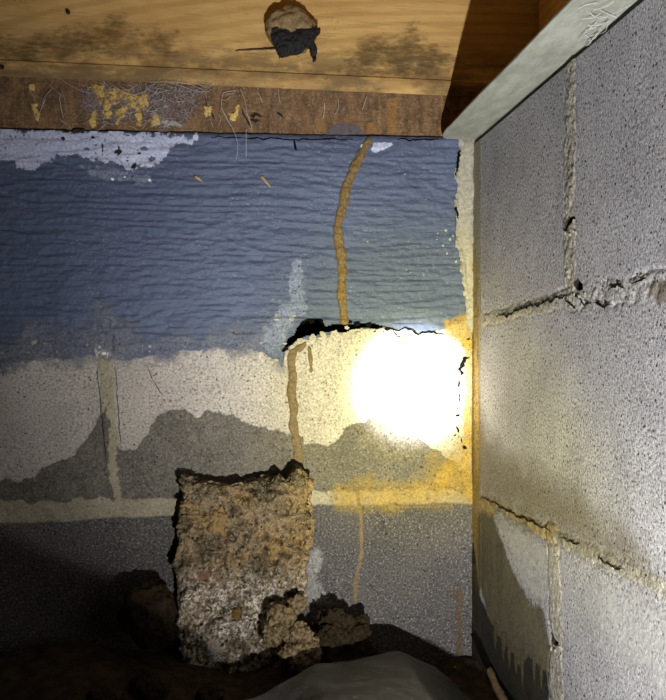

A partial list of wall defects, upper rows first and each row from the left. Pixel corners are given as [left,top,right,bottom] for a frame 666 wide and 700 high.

peeling [0,129,198,184]
crack [494,277,646,318]
crack [381,325,444,338]
damp [0,409,472,504]
crack [482,497,581,545]
damp [472,509,550,700]